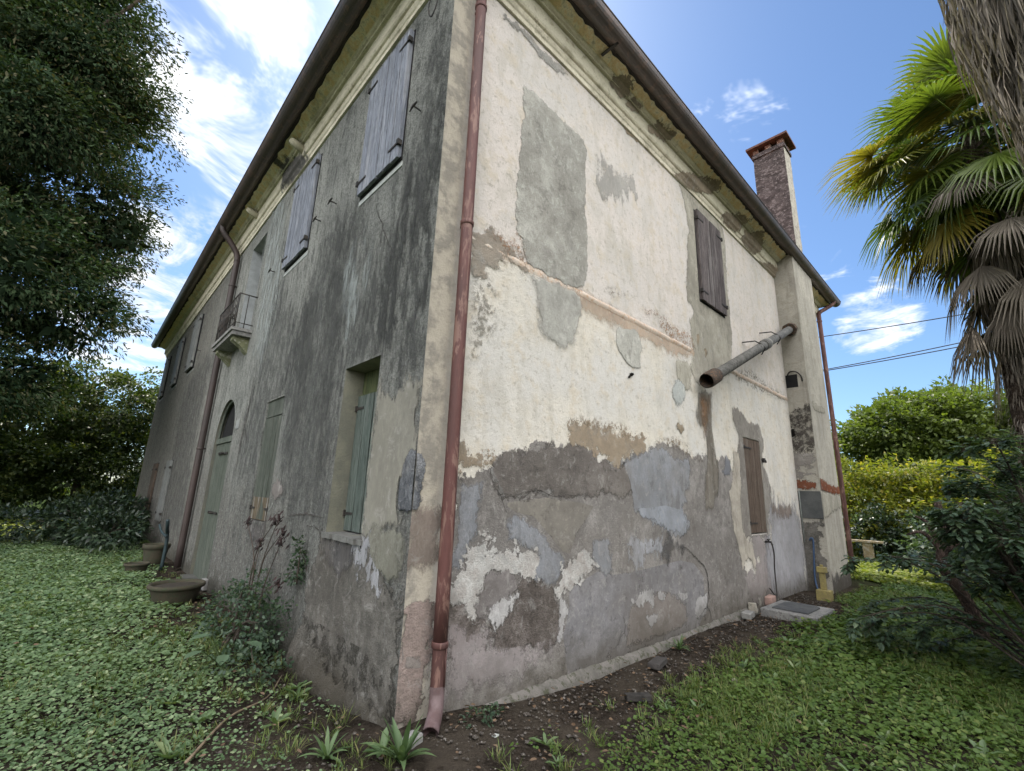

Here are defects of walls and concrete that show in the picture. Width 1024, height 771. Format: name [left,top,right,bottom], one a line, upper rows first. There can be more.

leakage [239,23,451,511]
flaking render [470,86,638,351]
flaking render [616,327,642,378]
leakage [321,536,362,578]
flaking render [302,528,435,731]
flaking render [398,449,426,513]
leakage [443,624,552,712]
flaking render [444,418,762,712]